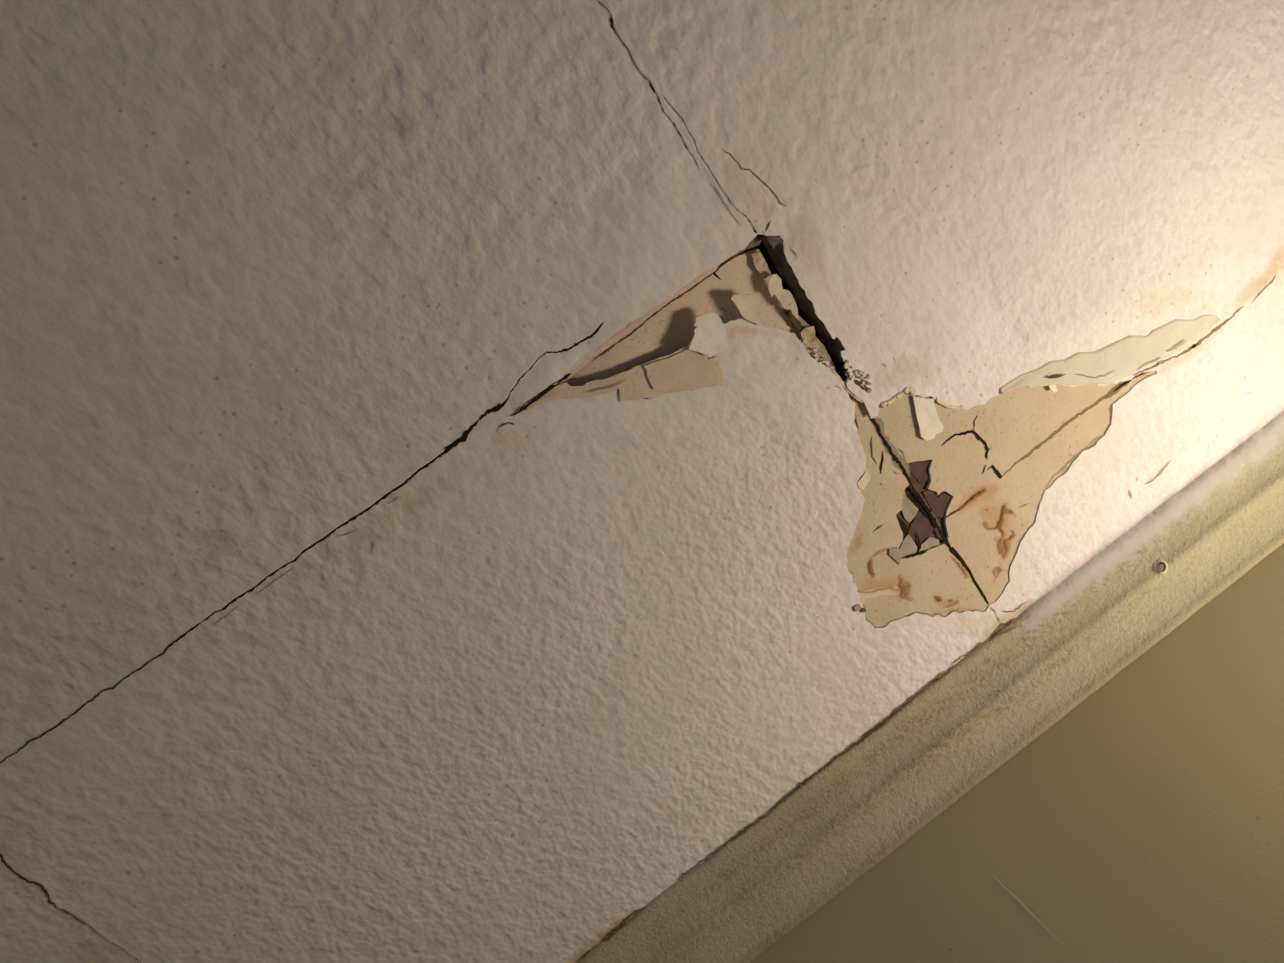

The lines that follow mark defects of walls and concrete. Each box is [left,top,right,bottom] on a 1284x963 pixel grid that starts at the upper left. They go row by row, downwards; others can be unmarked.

crack [597,0,798,257]
crack [0,319,605,763]
peeling [513,235,1220,628]
crack [677,275,1276,880]
rust [993,503,1016,540]
crack [0,849,141,963]
crack [581,907,645,958]